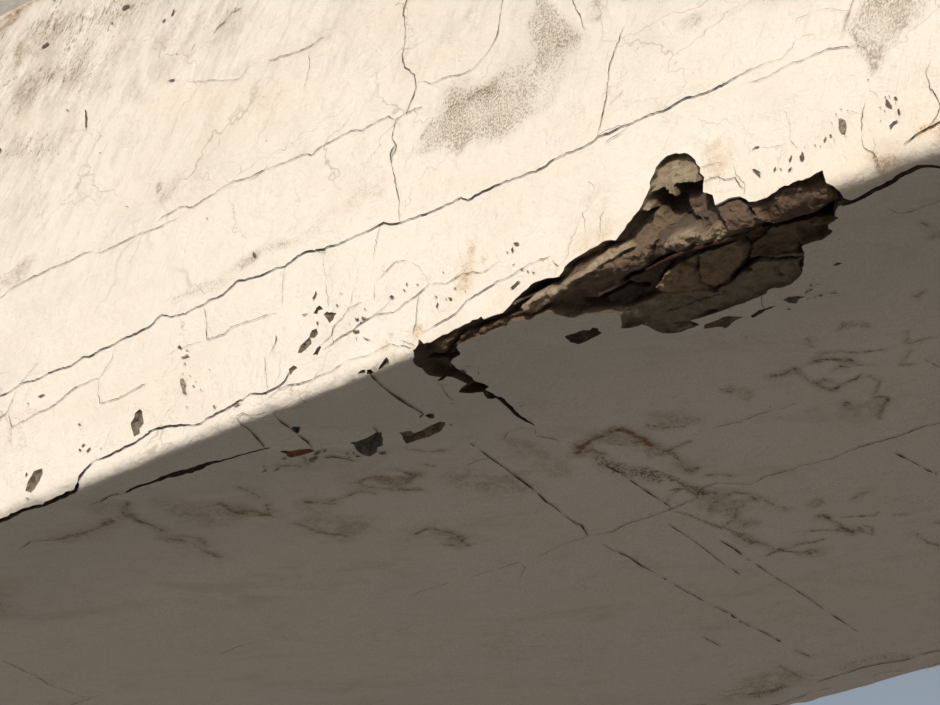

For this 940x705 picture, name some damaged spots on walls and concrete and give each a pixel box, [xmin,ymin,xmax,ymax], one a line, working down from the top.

spalling [429,106,510,149]
peeling [820,110,848,147]
crack [840,89,940,214]
crack [904,69,940,144]
crack [0,0,866,523]
spalling [413,153,853,399]
corrosion [573,429,755,510]
crack [468,423,938,642]
crack [782,651,938,704]